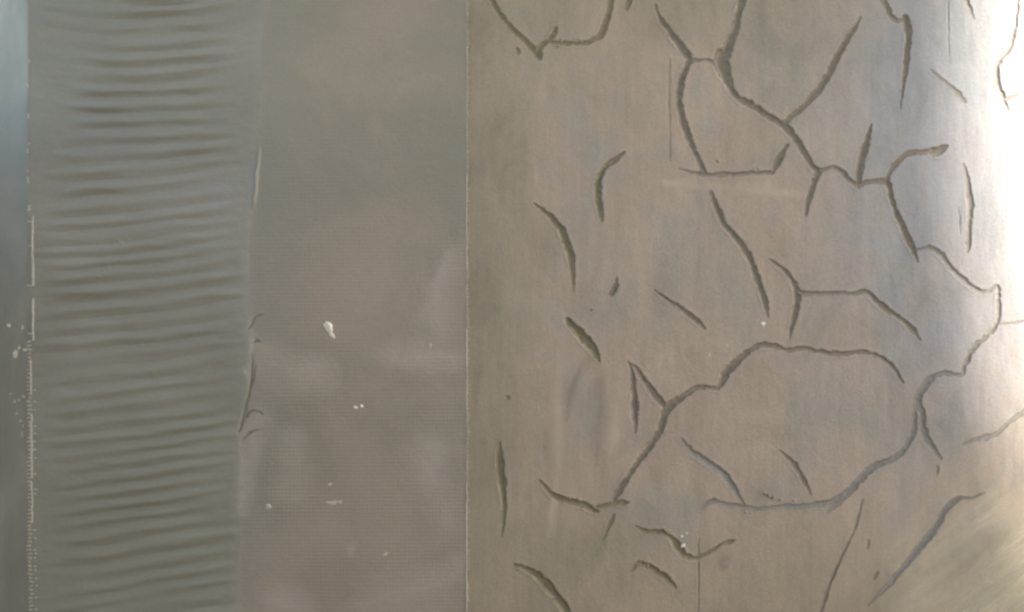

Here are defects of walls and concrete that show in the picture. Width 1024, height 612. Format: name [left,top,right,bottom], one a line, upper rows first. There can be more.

crack [491,0,1024,612]